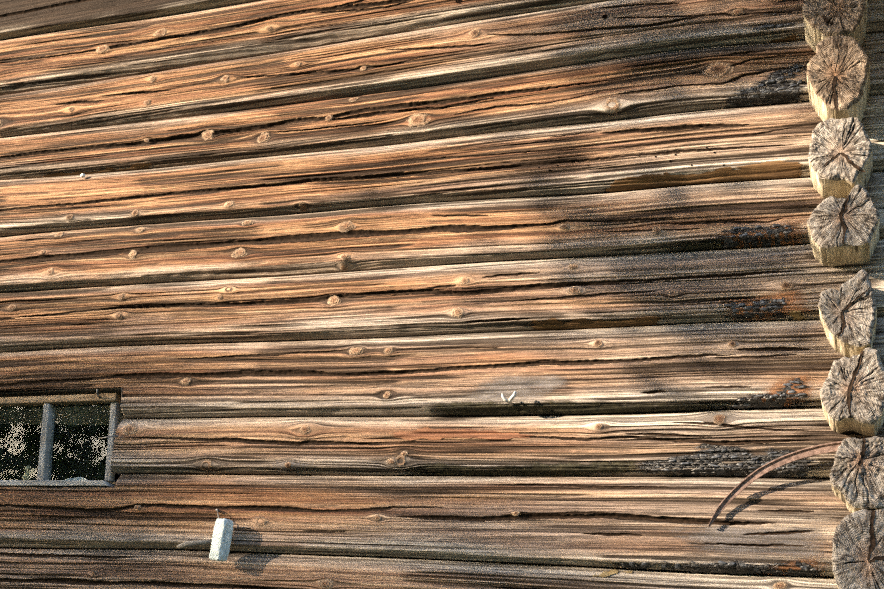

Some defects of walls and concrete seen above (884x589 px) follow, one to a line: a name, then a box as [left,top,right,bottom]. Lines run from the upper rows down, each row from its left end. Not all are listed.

crack [0,0,415,64]
crack [240,2,789,78]
crack [824,152,865,172]
crack [839,196,849,243]
crack [0,270,802,323]
crack [837,287,870,336]
crack [0,347,809,387]
crack [707,383,750,391]
crack [847,350,863,418]
crack [501,482,668,490]
crack [0,504,814,547]
crack [867,510,884,563]